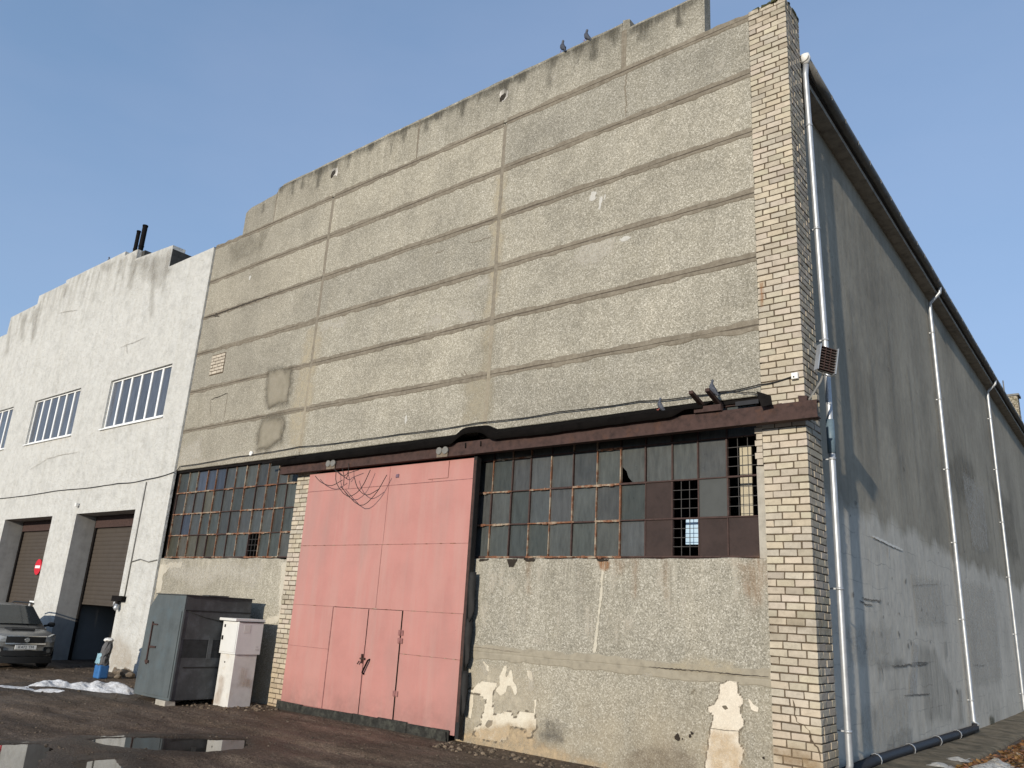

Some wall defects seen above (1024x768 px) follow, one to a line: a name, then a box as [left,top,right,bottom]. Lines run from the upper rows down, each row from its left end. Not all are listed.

water stain [585,562,605,653]
peeling [468,661,538,743]
peeling [704,680,758,768]